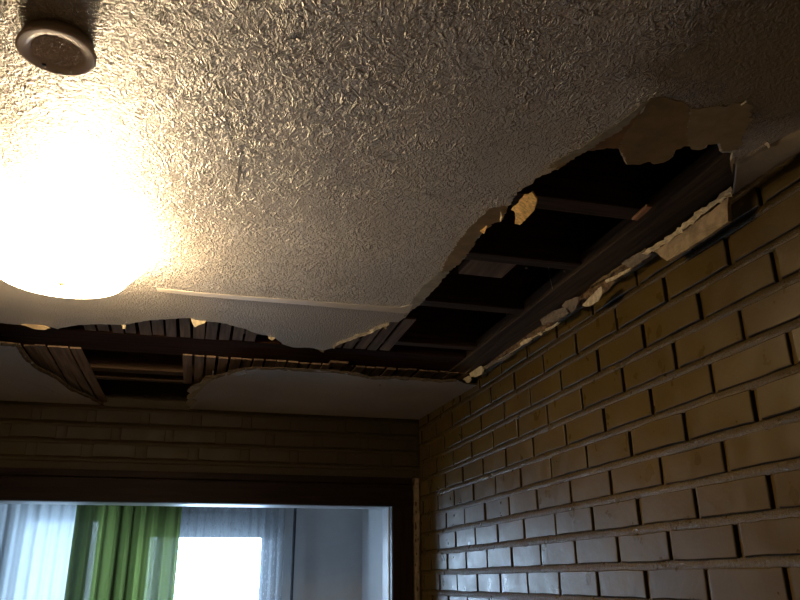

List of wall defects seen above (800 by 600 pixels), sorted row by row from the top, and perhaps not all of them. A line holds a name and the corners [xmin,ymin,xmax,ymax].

spalling [548,96,753,169]
flaking render [186,187,732,407]